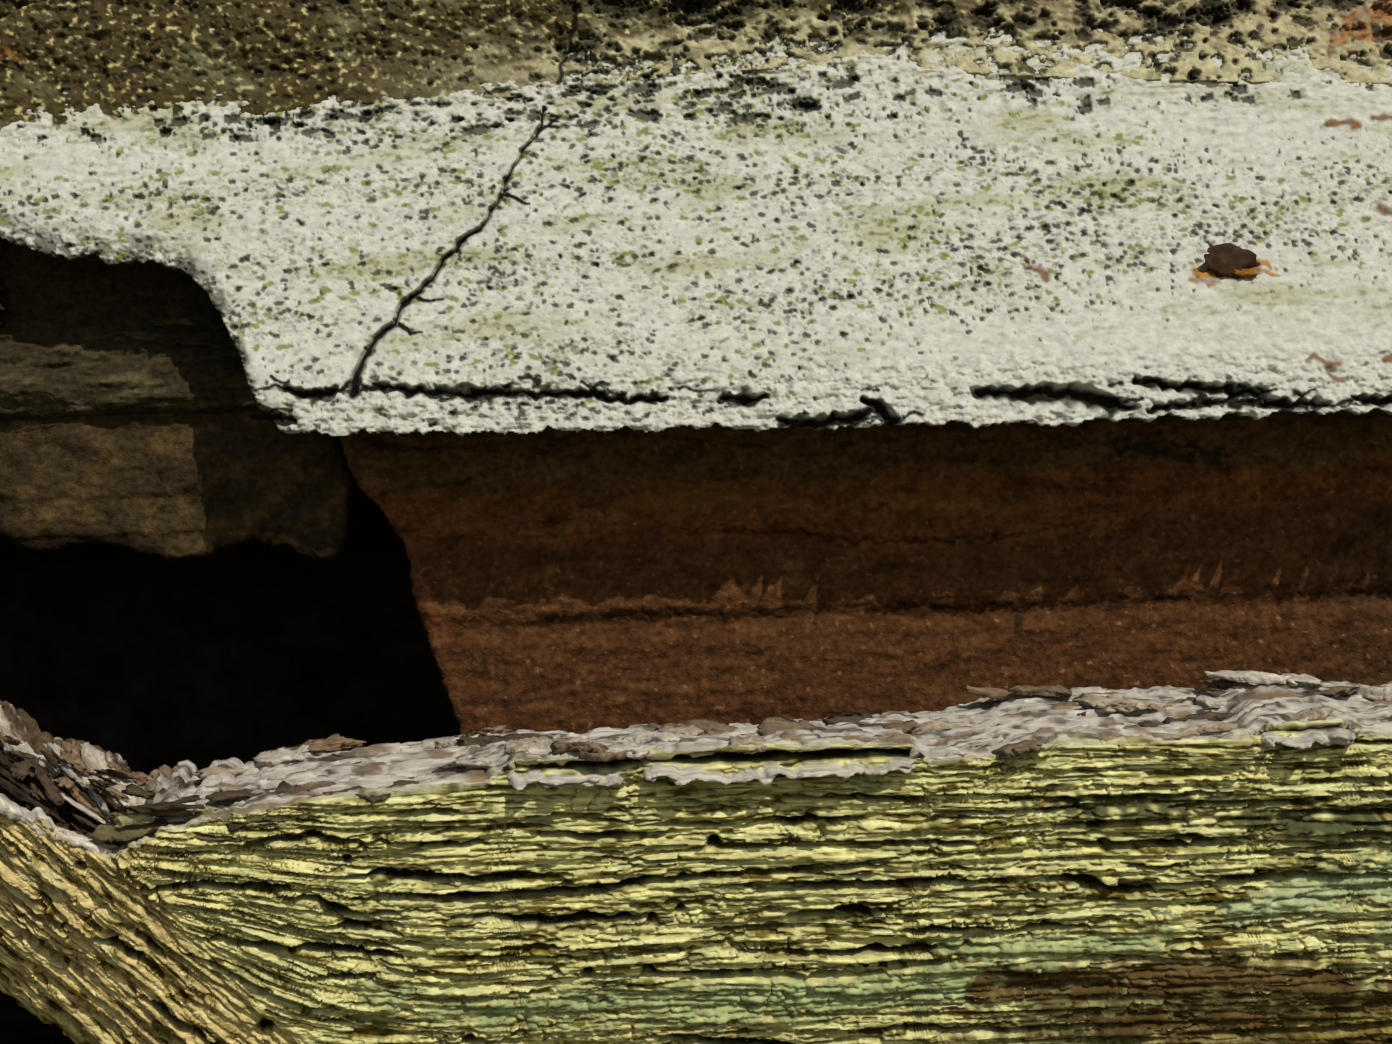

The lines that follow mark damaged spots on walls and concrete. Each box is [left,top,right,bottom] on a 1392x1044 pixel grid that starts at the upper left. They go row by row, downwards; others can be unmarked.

flaking render [0,239,361,561]
crack [324,0,578,398]
rust [1189,260,1281,285]